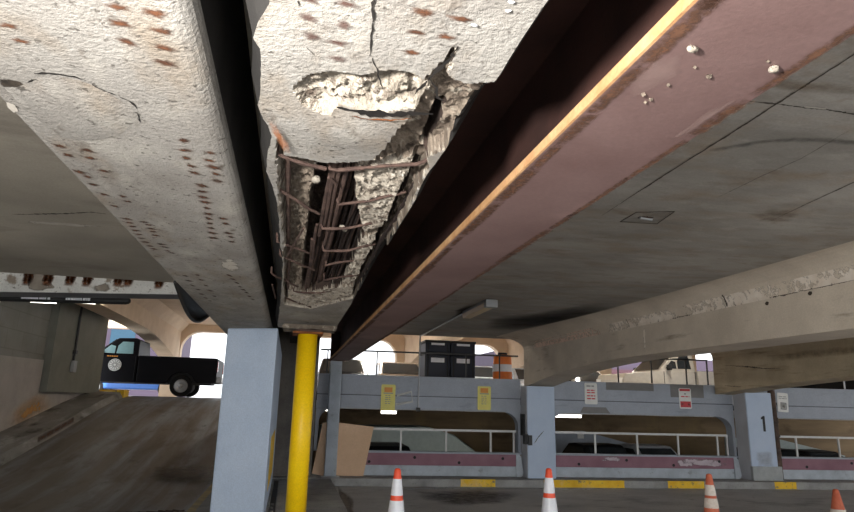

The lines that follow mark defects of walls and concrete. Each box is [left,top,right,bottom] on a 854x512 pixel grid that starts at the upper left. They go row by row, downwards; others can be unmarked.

rust [109,4,129,26]
crack [28,72,141,122]
rust [155,45,174,66]
crack [369,0,383,88]
crack [337,46,458,121]
crack [750,101,854,115]
rust [759,27,854,90]
rust [179,138,234,243]
spalling [270,47,483,309]
rust [23,274,54,285]
rust [65,276,92,286]
peeling [685,265,854,316]